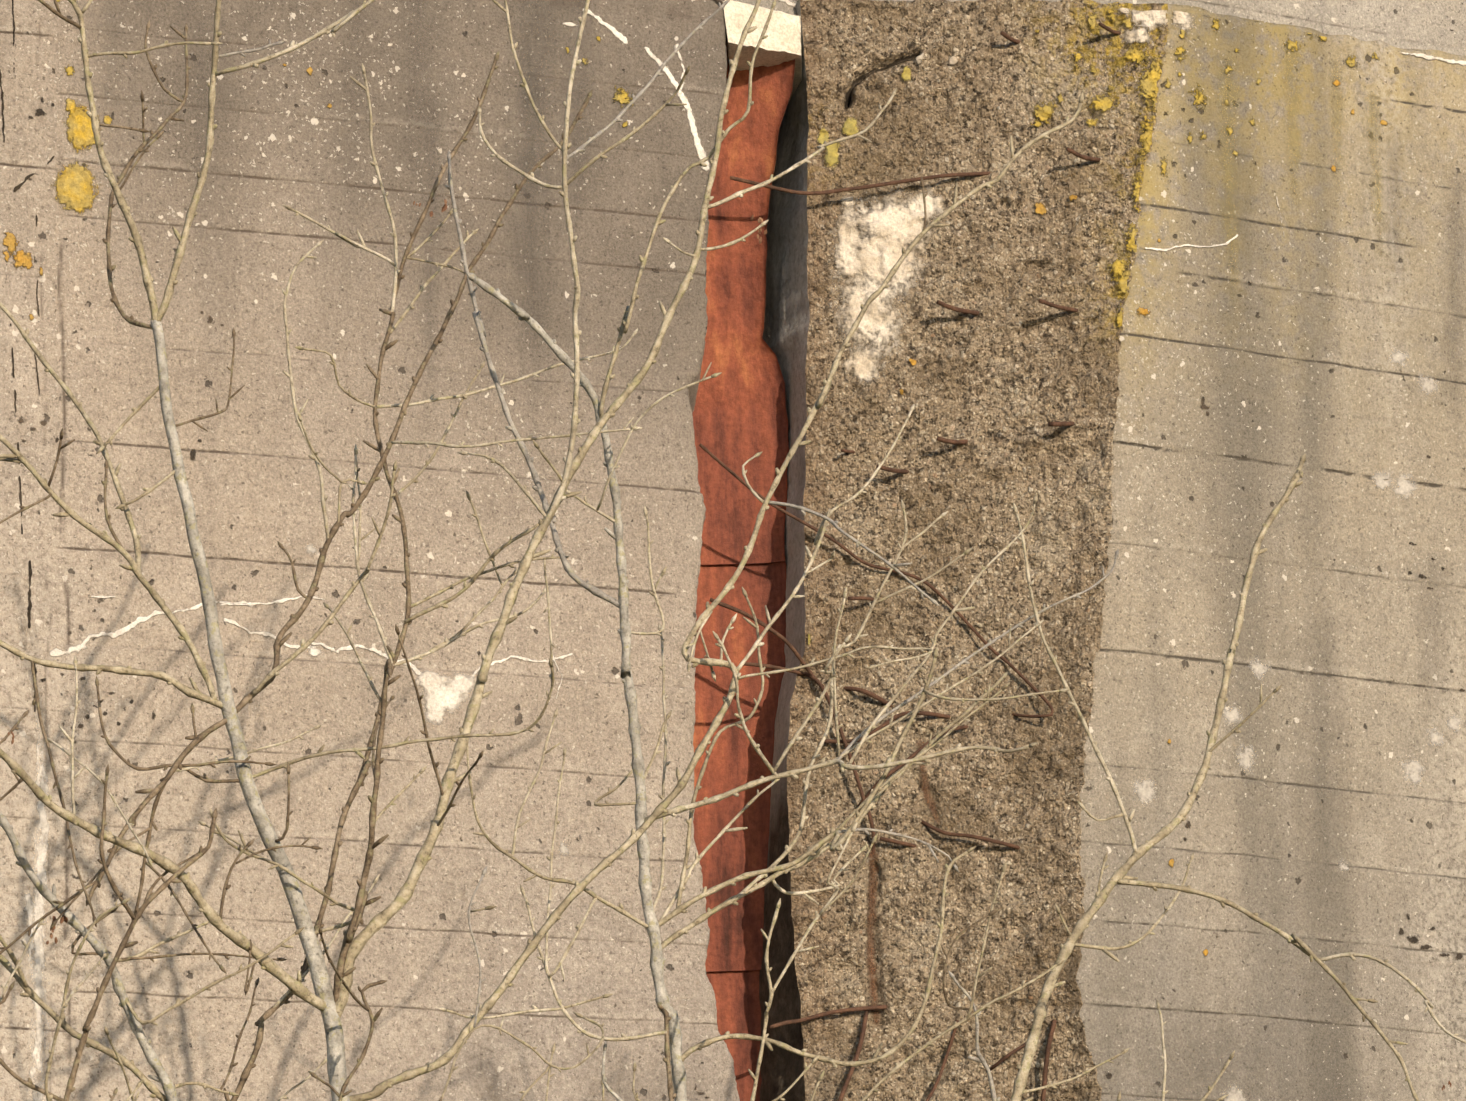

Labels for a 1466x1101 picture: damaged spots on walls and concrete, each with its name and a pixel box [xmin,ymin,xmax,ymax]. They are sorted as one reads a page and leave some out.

spalling [1098,8,1129,35]
crack [0,0,15,143]
crack [845,54,920,109]
damp [1402,52,1466,66]
crack [13,156,54,227]
spalling [730,171,990,208]
spalling [936,300,979,315]
crack [10,280,573,724]
rust [692,43,795,1101]
spalling [699,443,1054,718]
spalling [697,511,968,853]
spalling [990,1042,1026,1071]